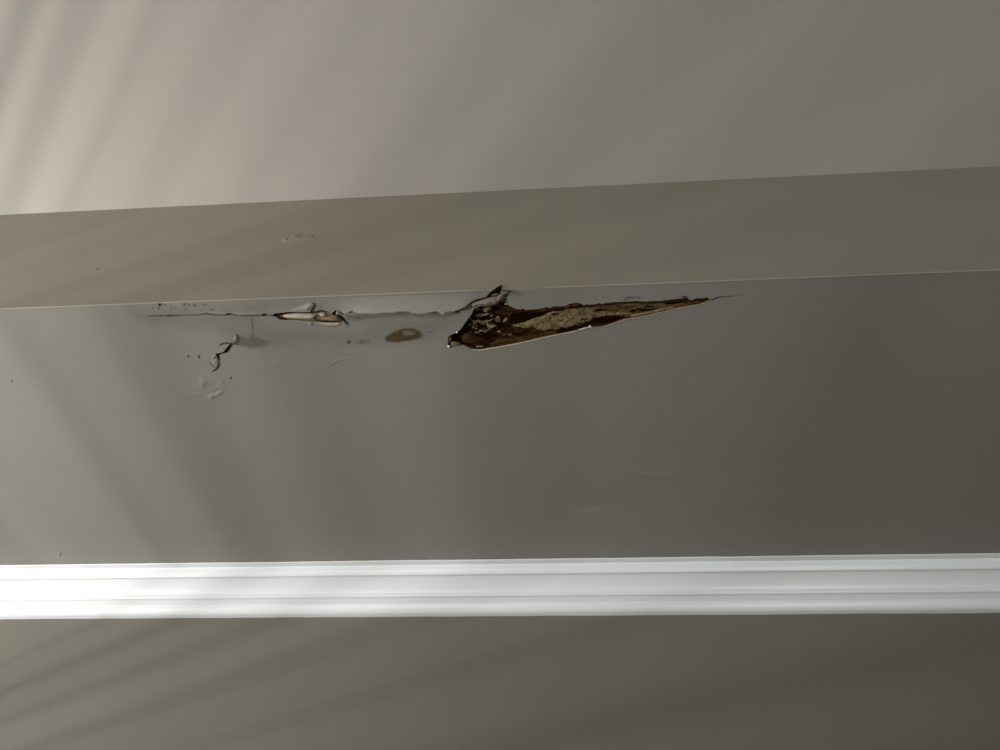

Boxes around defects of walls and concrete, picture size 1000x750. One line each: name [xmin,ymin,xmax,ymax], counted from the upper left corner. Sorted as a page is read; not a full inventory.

peeling [273,285,708,326]
crack [147,311,273,372]
water stain [386,329,421,342]